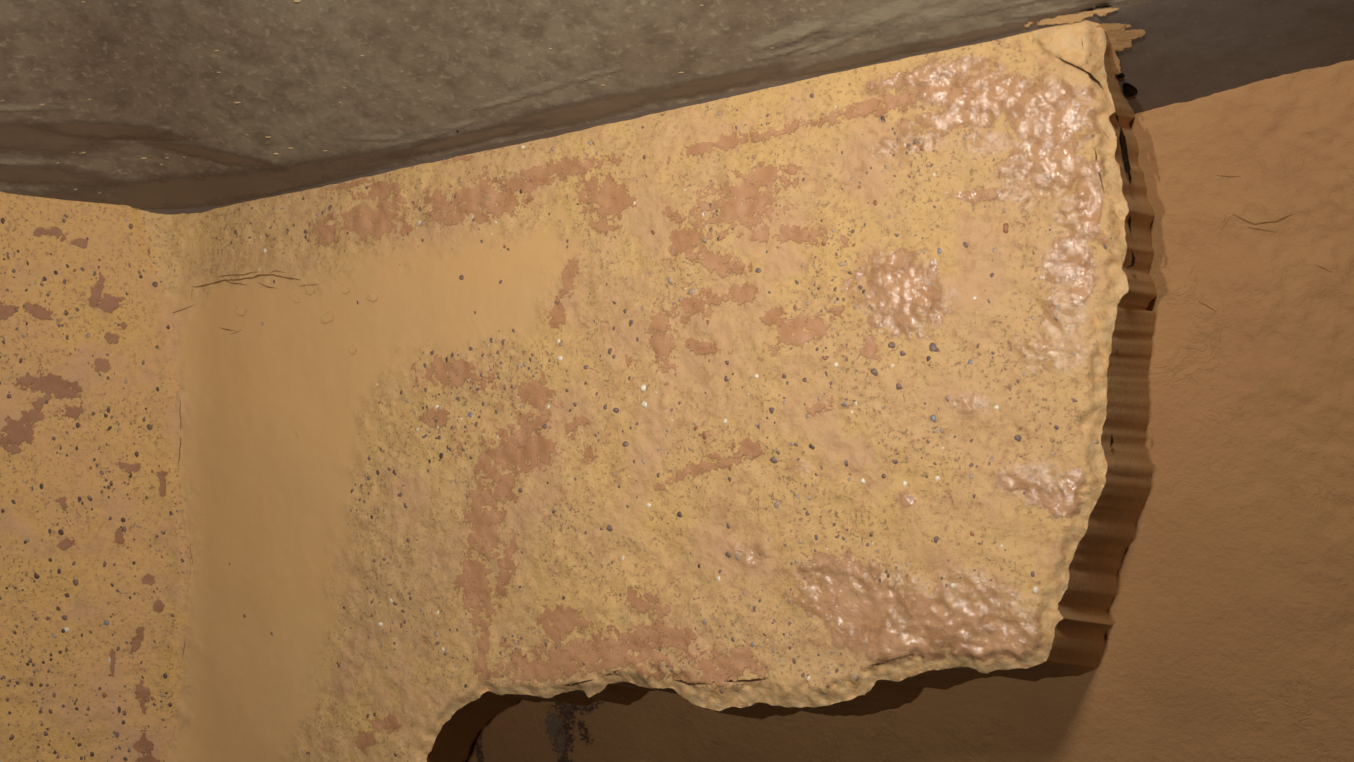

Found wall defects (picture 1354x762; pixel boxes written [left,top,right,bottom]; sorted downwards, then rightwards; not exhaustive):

spalling [208,197,332,254]
spalling [348,328,612,525]
spalling [702,32,1157,719]
spalling [332,584,678,762]